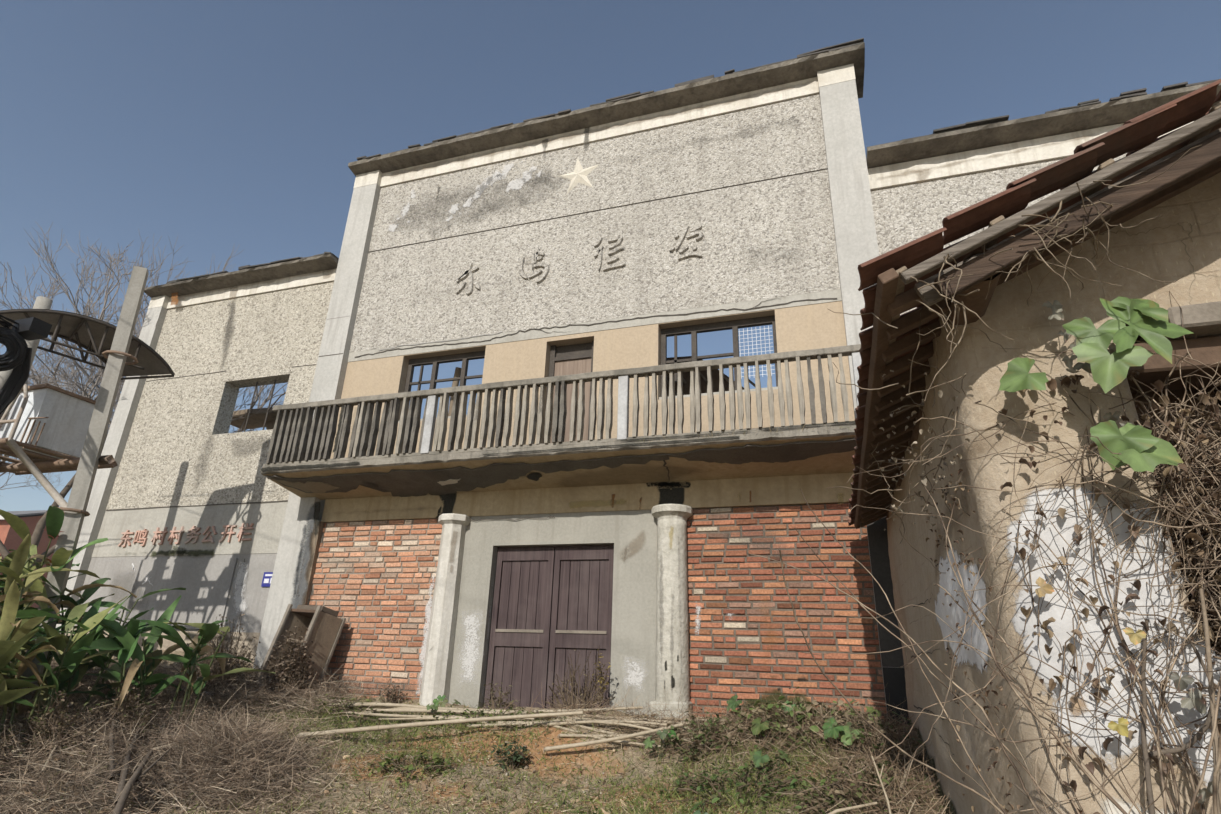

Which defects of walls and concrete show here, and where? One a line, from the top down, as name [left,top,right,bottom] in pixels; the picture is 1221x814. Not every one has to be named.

peeling [265,438,857,497]
peeling [935,548,990,674]
peeling [1007,486,1221,786]
peeling [1101,798,1179,814]